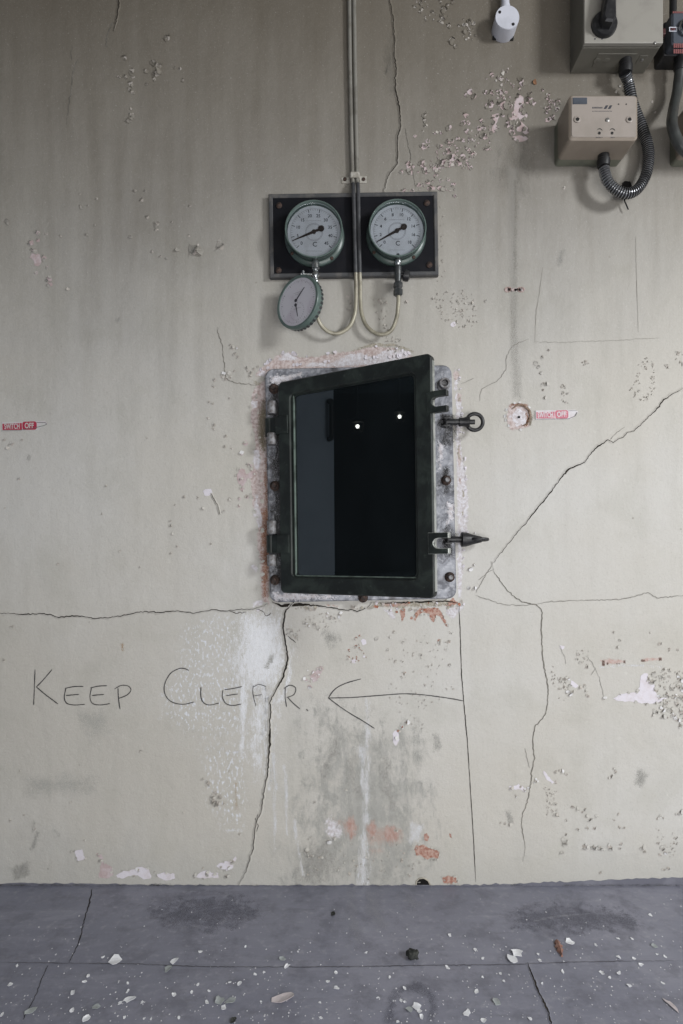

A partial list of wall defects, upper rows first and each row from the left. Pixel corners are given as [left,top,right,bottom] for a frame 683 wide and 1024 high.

crack [382,0,416,192]
peeling [399,68,561,197]
flaking render [206,297,414,612]
leakage [155,604,443,886]
crack [0,387,683,885]
flaking render [286,366,477,746]
peeling [551,666,590,701]
peeling [575,631,683,729]
peeling [116,867,175,881]
peeling [193,856,237,880]